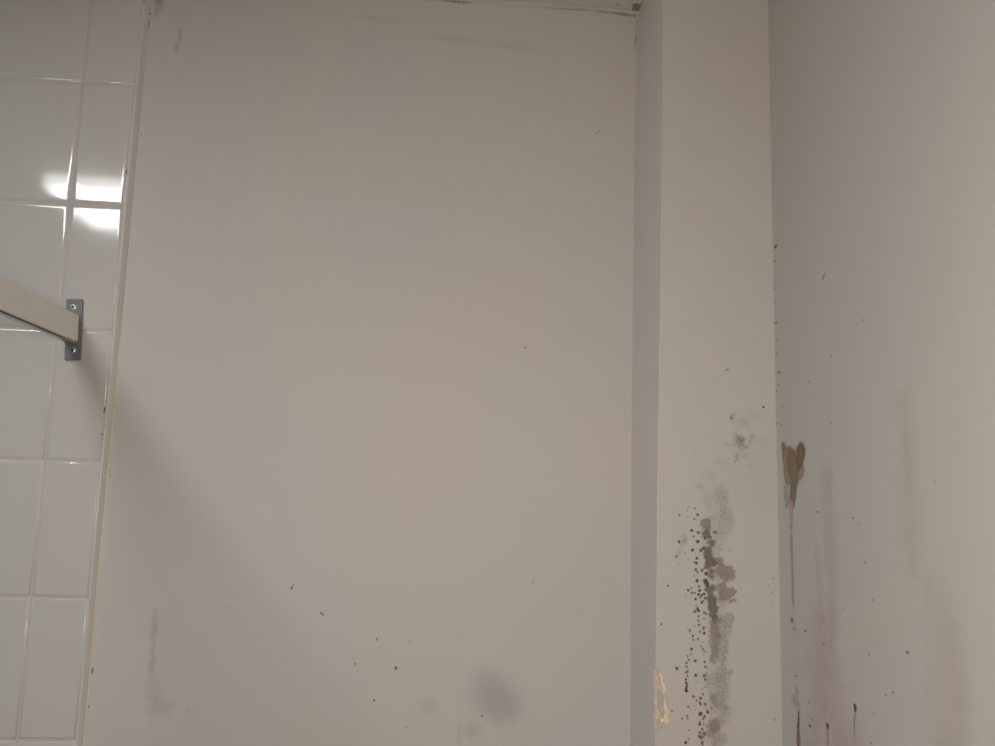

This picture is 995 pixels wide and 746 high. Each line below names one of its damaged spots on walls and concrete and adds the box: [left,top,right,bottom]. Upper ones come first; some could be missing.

peeling [654,670,670,731]
damp [671,508,737,745]